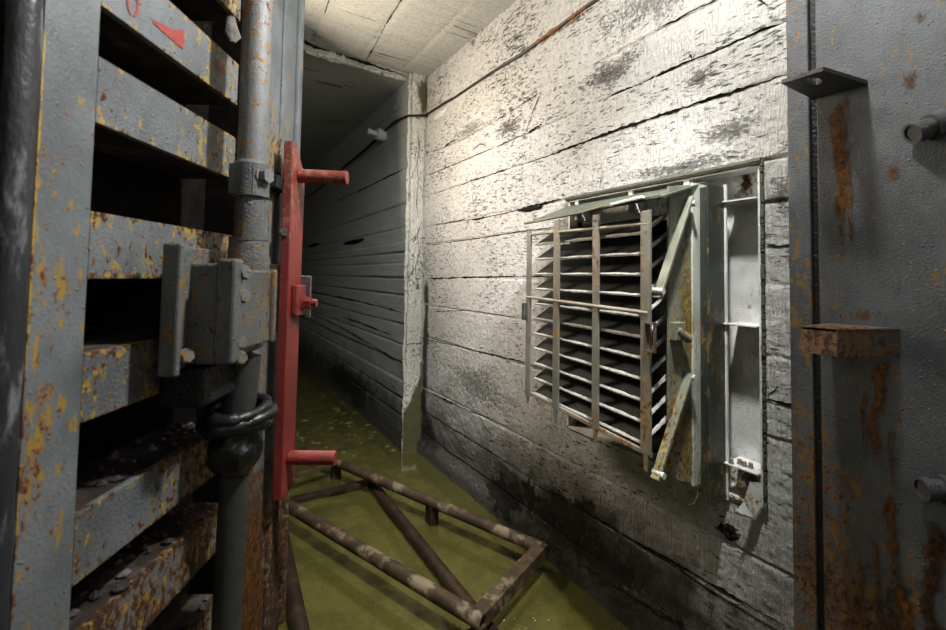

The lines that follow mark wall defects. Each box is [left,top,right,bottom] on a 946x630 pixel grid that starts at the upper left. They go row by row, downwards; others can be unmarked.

rust [534,2,601,48]
crack [603,0,782,100]
crack [334,74,787,281]
rust [829,98,852,240]
rust [680,232,692,376]
damp [486,462,714,630]
rust [856,498,946,630]